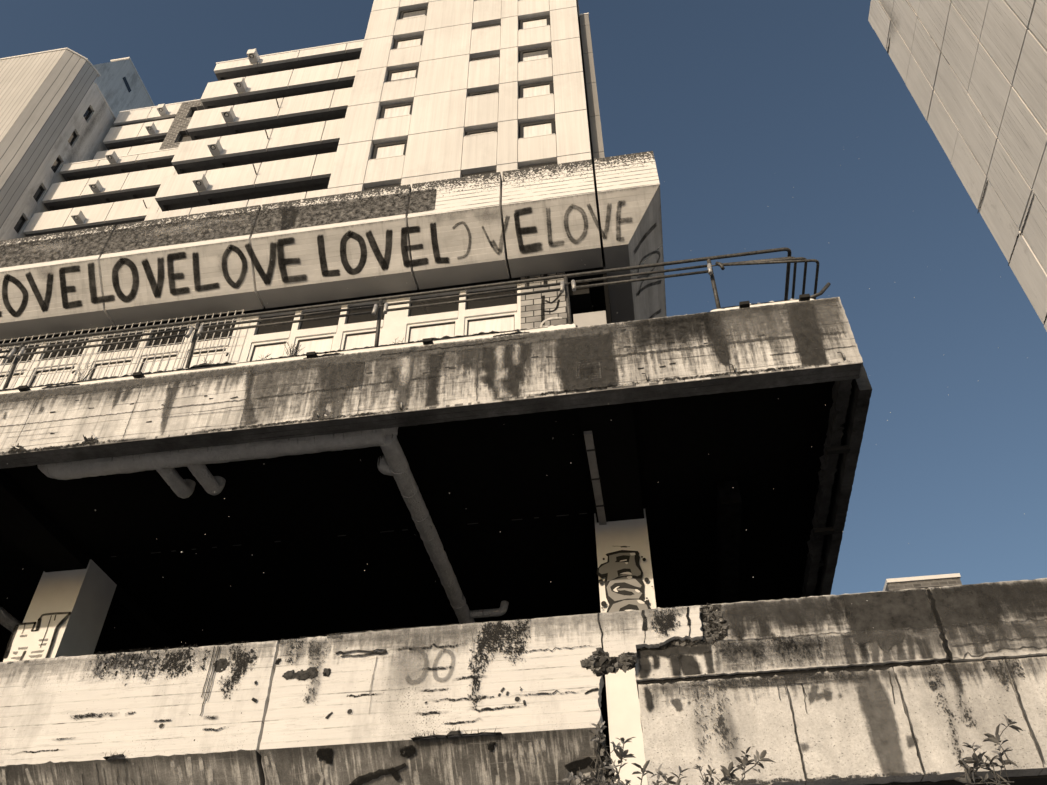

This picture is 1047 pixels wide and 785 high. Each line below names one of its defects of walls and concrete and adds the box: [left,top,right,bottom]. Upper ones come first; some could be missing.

damp [0,298,844,433]
damp [198,646,229,731]
damp [637,582,1047,785]
damp [171,759,213,781]
damp [513,740,546,785]